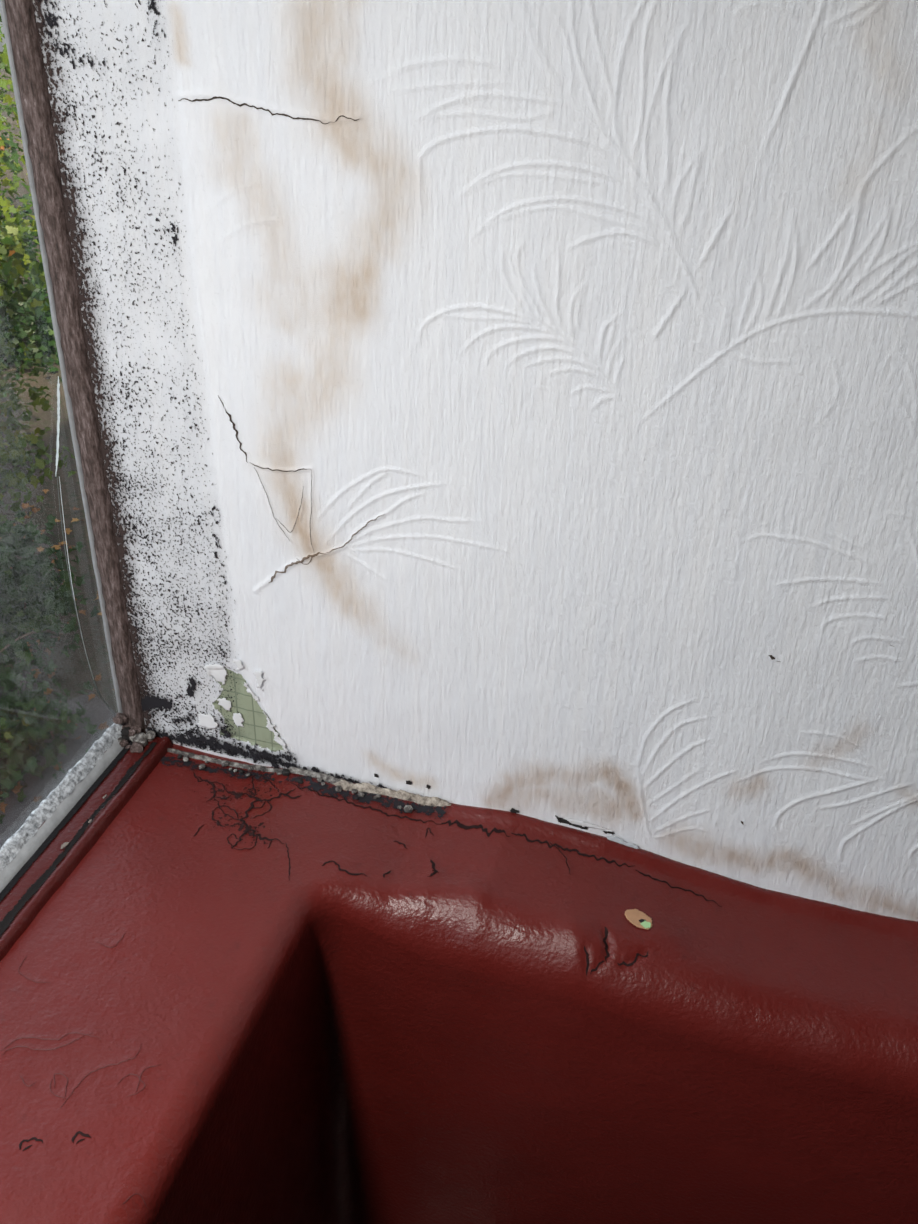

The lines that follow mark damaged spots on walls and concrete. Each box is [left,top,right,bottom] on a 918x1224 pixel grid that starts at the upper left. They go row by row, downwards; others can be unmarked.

crack [178,96,359,124]
leakage [32,0,243,758]
crack [218,396,314,551]
flaking render [0,659,451,936]
crack [193,772,722,907]
flaking render [555,815,639,849]